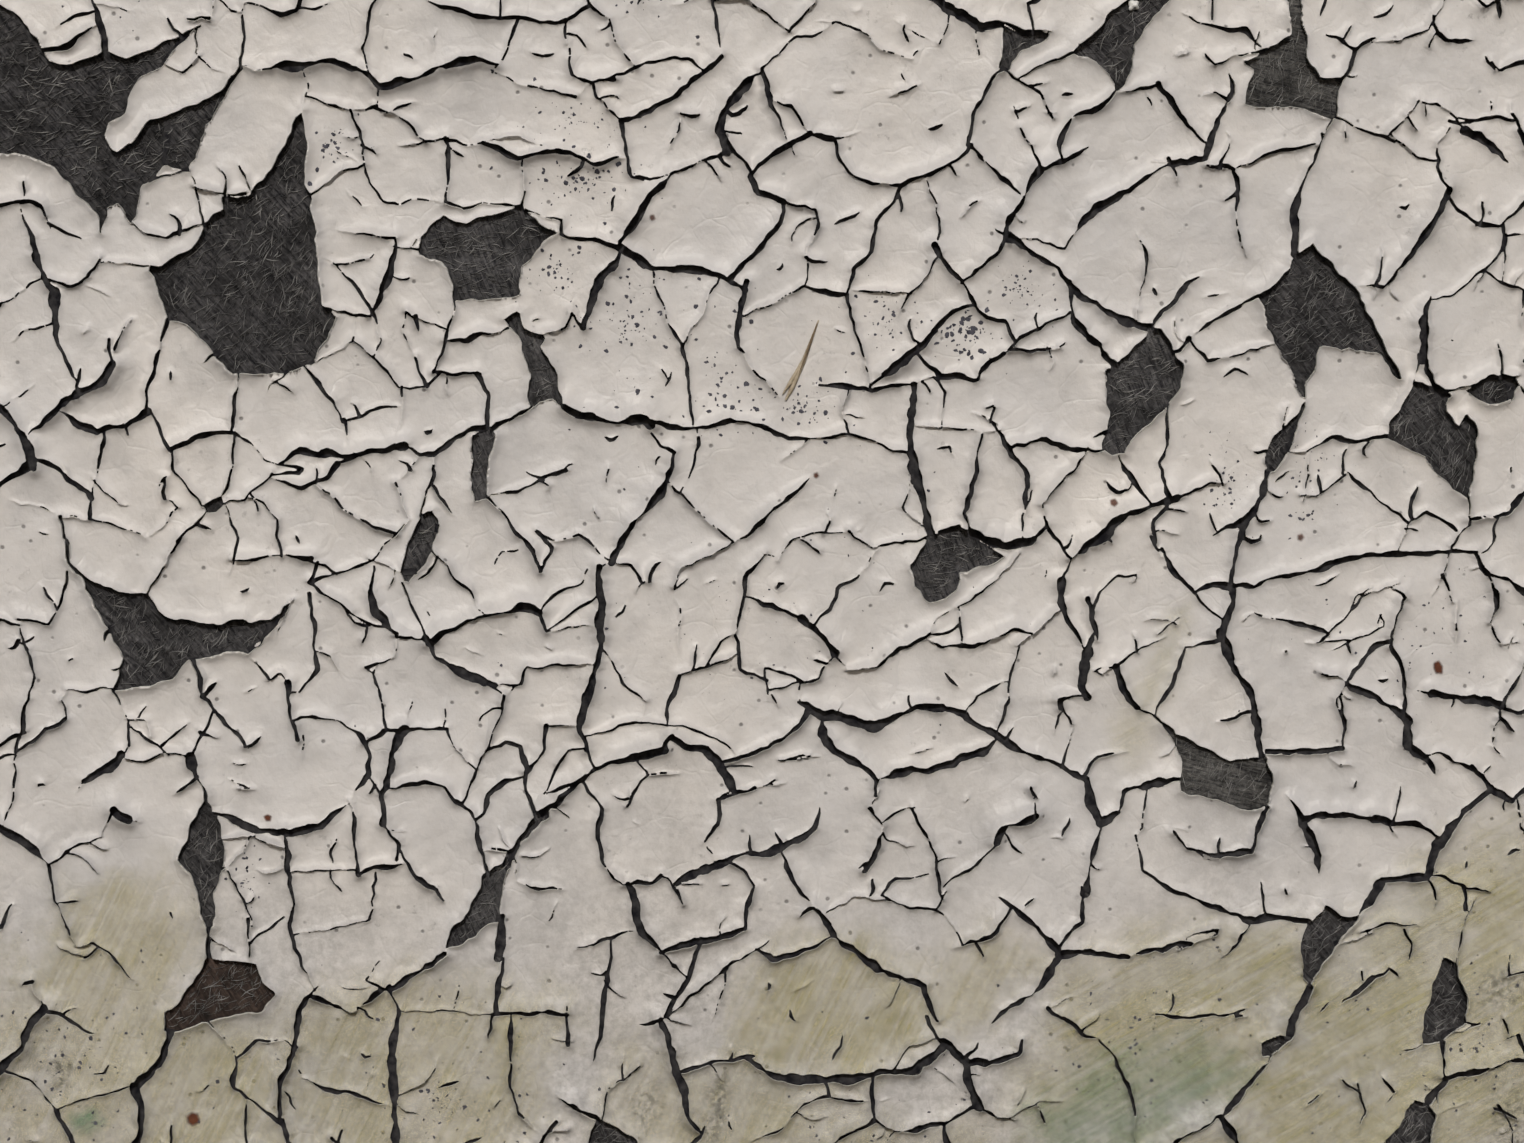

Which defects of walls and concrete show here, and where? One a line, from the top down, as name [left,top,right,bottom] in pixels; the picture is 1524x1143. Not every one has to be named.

crack [0,181,260,537]
peeling [0,0,355,392]
peeling [384,190,581,600]
peeling [981,0,1188,110]
peeling [1240,227,1524,516]
crack [1367,148,1524,401]
crack [0,561,130,978]
crack [67,656,261,803]
peeling [43,500,310,707]
crack [963,404,1524,920]
peeling [147,782,294,1049]
crack [0,980,177,1143]